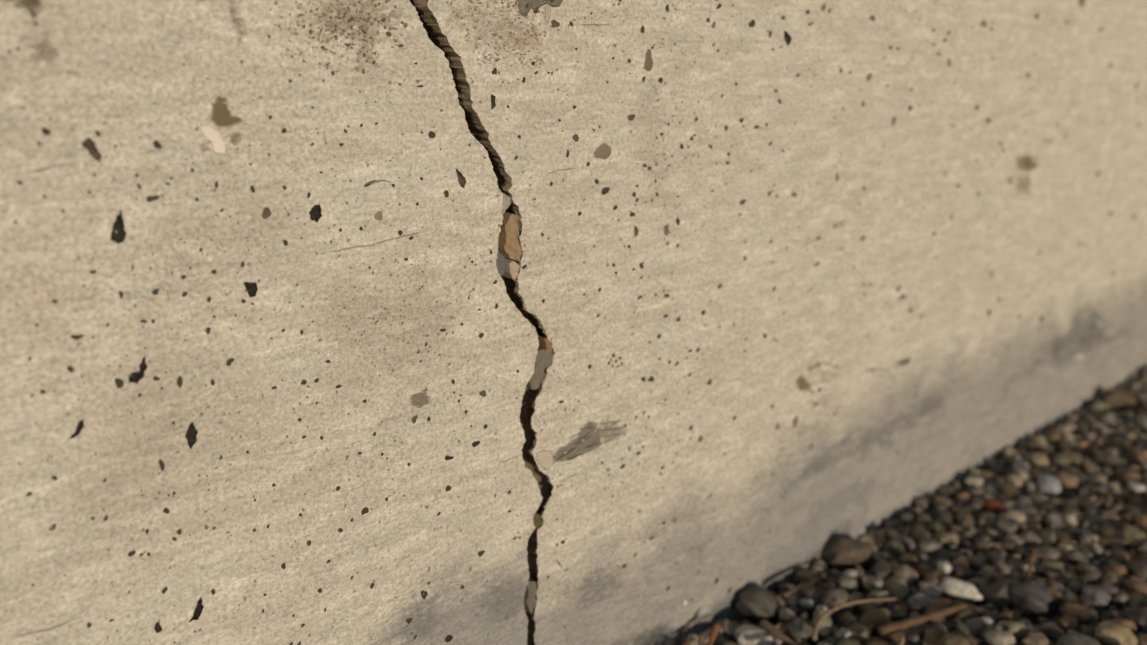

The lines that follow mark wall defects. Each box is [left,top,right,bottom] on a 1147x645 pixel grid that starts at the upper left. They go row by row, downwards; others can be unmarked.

crack [409,0,578,645]